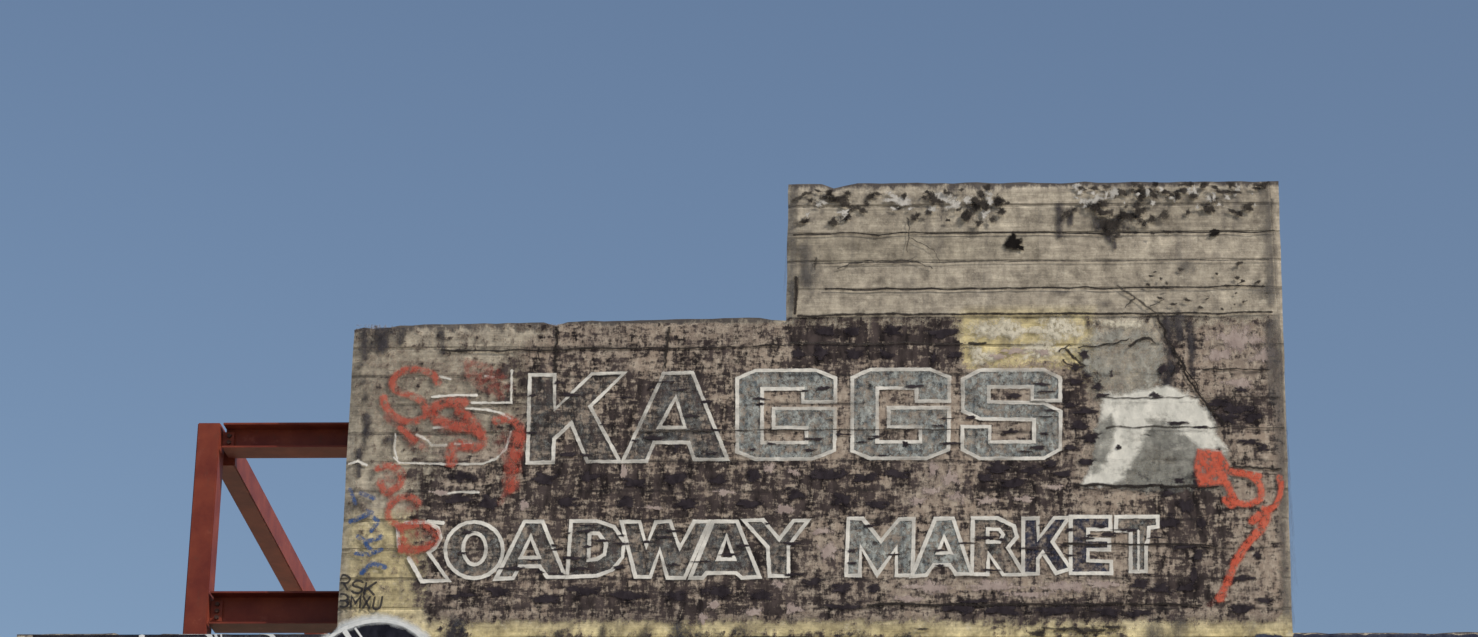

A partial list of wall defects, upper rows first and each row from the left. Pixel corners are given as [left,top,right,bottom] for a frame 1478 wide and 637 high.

spalling [792,184,1010,227]
spalling [1061,181,1270,238]
spalling [1003,233,1024,251]
crack [441,218,1284,429]
crack [641,426,960,434]
crack [1073,466,1282,491]